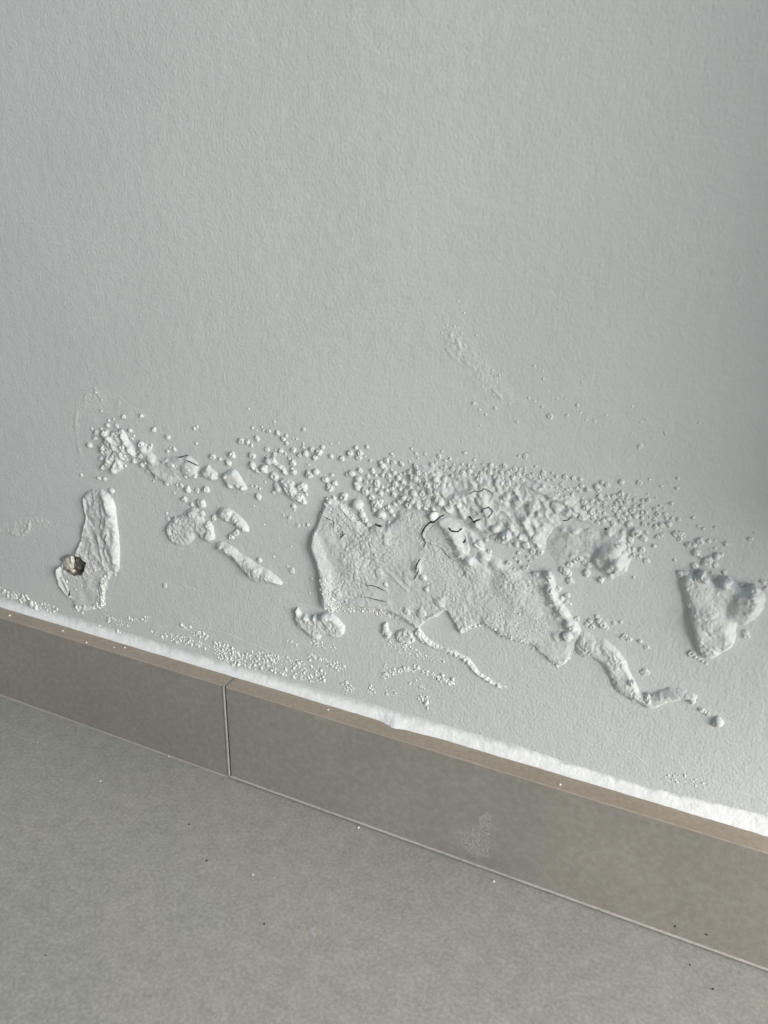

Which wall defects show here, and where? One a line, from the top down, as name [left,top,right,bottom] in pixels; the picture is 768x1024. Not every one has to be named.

spalling [61,555,86,576]